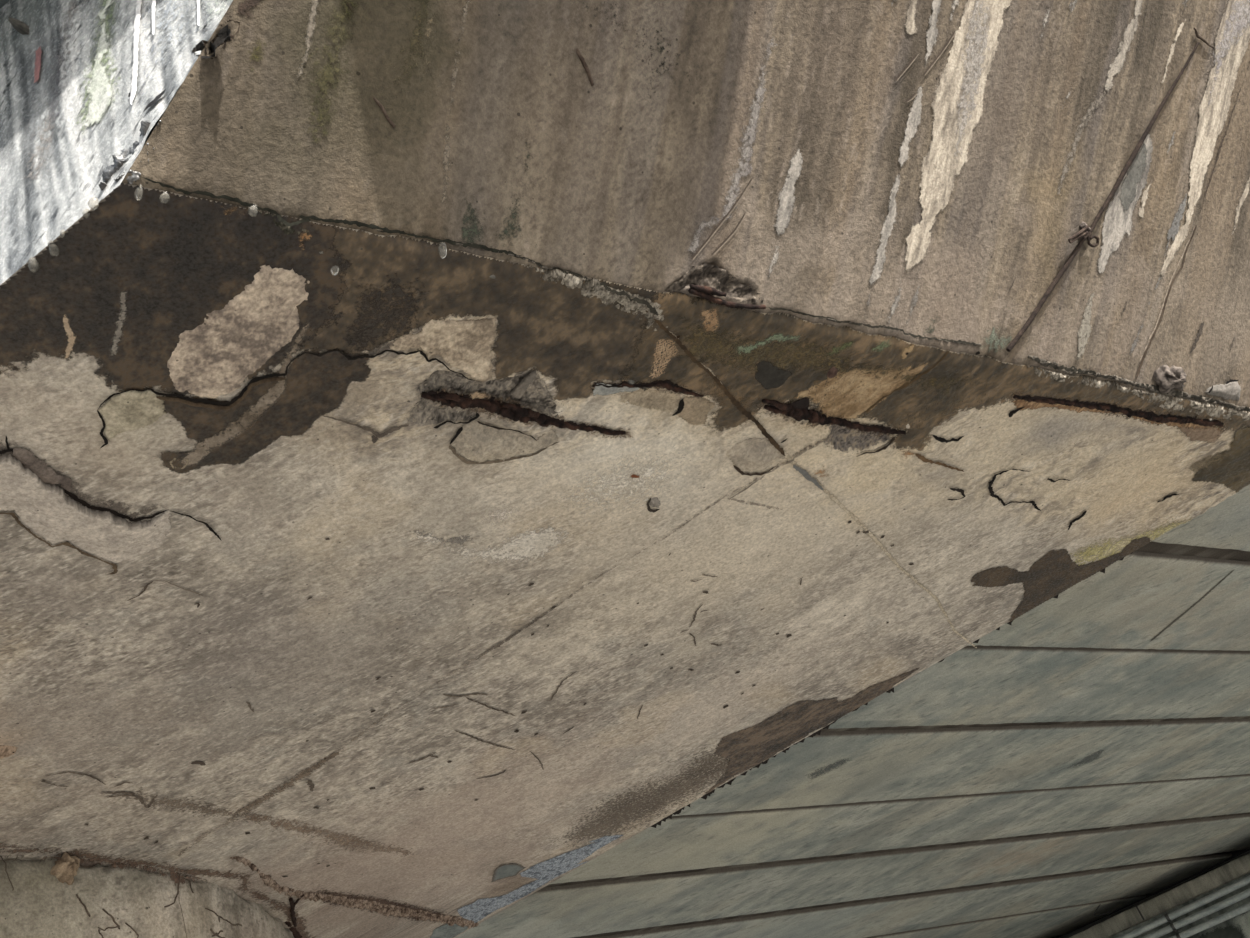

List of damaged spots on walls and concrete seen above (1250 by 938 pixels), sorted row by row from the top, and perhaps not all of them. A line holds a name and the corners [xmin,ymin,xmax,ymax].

water stain [867,0,1012,324]
efflorescence [1098,131,1175,273]
efflorescence [1149,0,1250,304]
spalling [98,120,982,440]
crack [0,436,221,540]
crack [97,350,481,448]
peeling [762,362,928,457]
corrosion [619,292,1250,457]
crack [915,435,1070,511]
spalling [1011,355,1250,443]
crack [0,512,203,608]
water stain [430,668,919,938]